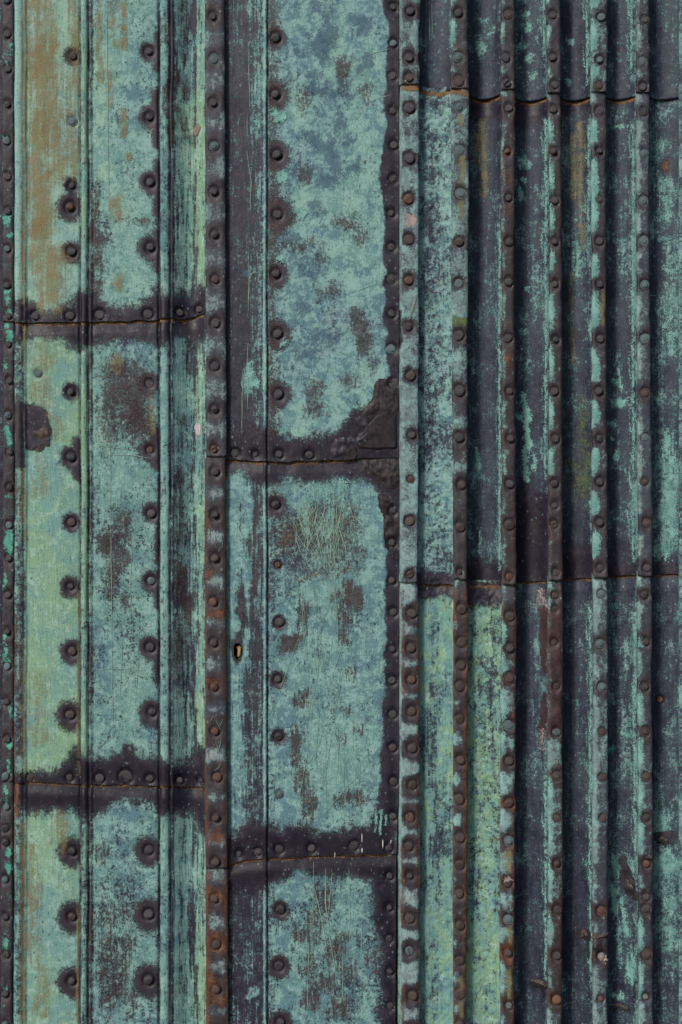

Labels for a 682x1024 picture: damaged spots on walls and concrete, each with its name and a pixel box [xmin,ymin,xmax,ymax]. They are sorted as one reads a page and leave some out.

rust [417,584,499,994]